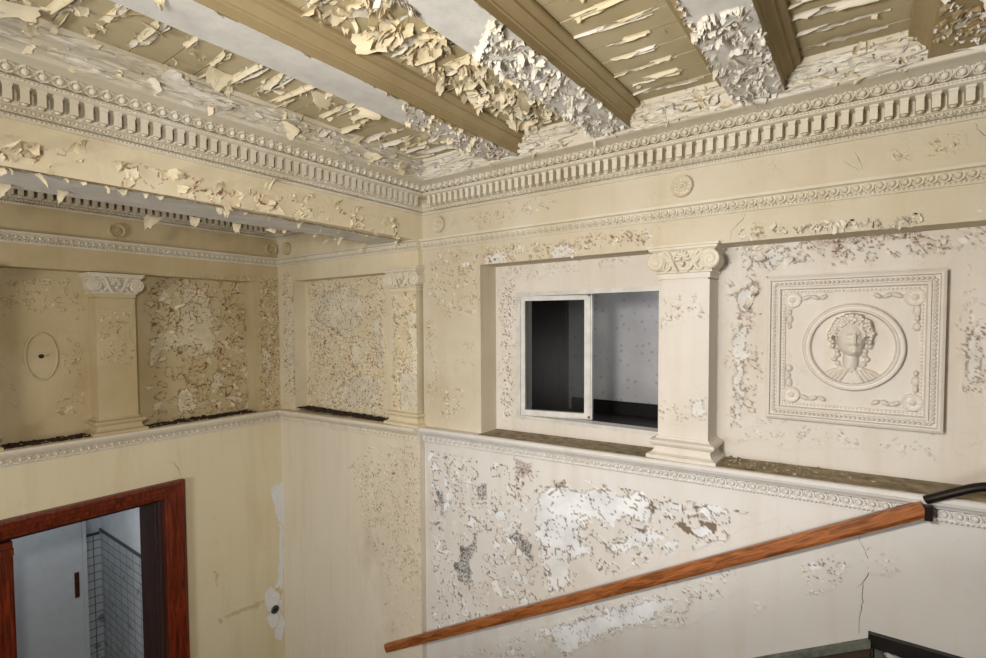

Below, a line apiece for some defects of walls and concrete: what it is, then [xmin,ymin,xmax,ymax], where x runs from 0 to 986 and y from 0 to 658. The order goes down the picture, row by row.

peeling [0,0,986,180]
peeling [0,132,400,251]
peeling [96,272,280,423]
peeling [307,223,662,422]
peeling [723,207,986,431]
peeling [346,439,778,658]
crack [858,536,871,632]